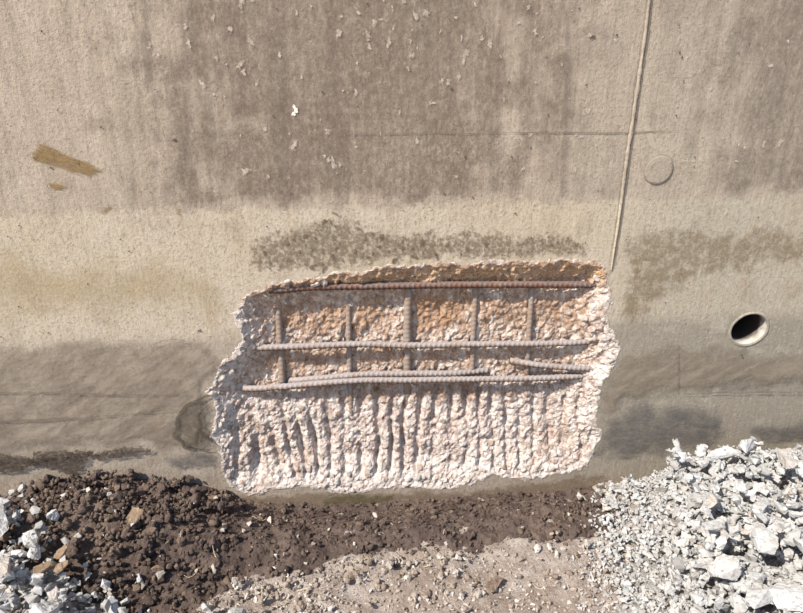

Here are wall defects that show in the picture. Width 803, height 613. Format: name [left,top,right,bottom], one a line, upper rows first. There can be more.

damp [251,212,586,273]
corrosion [261,261,605,296]
damp [623,232,801,314]
corrosion [281,299,393,332]
corrosion [414,292,470,332]
spalling [205,258,621,496]
damp [594,403,719,457]
damp [0,446,151,474]